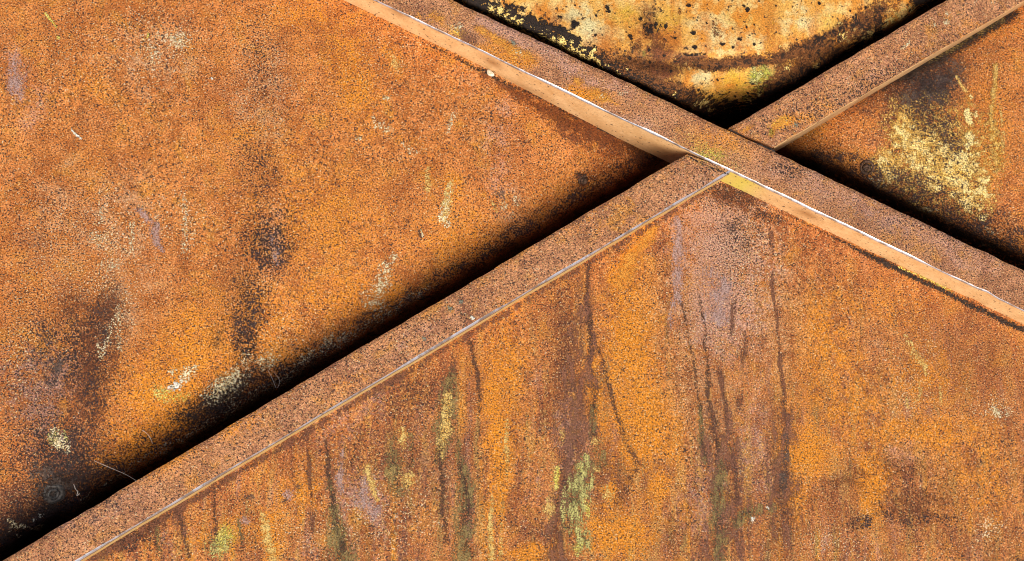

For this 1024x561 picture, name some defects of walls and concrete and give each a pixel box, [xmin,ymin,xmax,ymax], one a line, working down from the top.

rust [415,10,535,64]
rust [645,32,683,85]
rust [409,35,658,168]
rust [988,63,1005,174]
rust [612,224,660,291]
water stain [88,193,803,561]
rust [362,426,418,502]
rust [542,466,561,518]
rust [259,510,277,561]
rust [487,495,503,561]